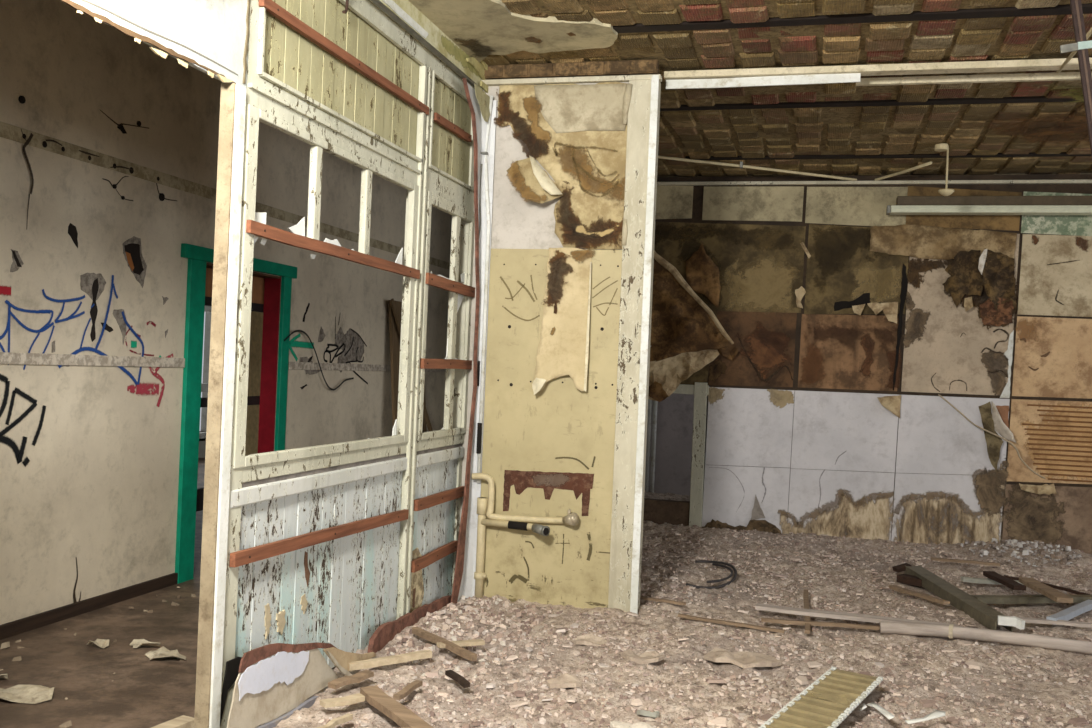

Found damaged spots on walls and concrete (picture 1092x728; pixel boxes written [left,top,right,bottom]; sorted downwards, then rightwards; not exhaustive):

flaking render [483,0,1092,177]
flaking render [123,236,147,288]
peeling [300,551,310,614]
peeling [264,603,286,639]